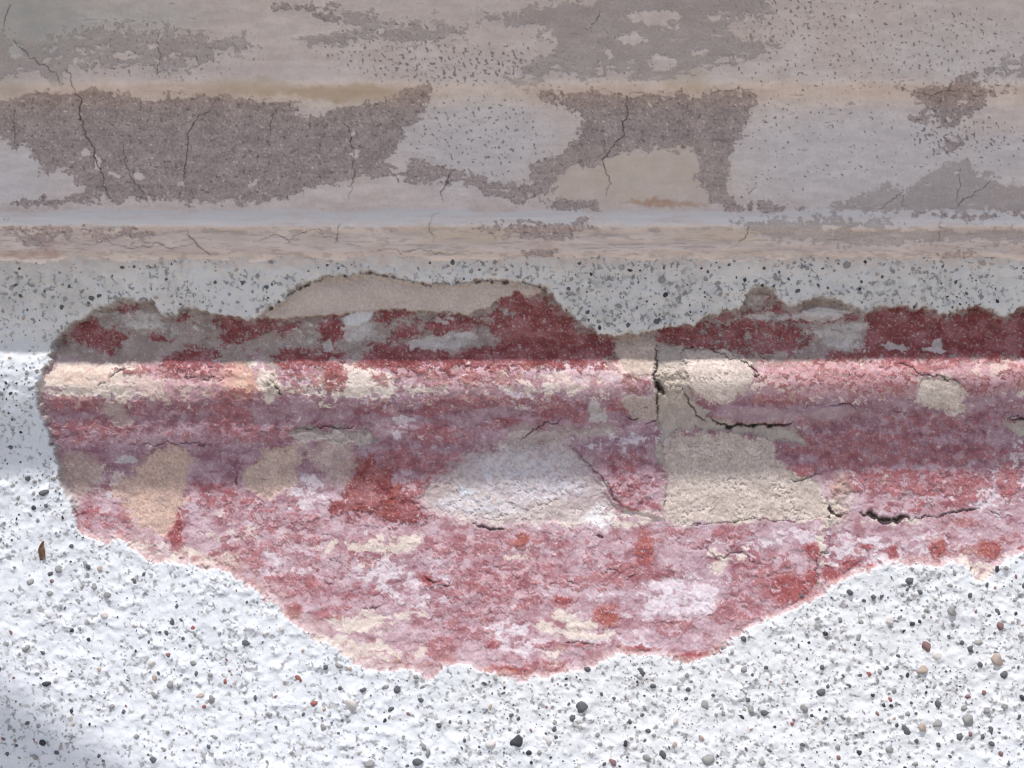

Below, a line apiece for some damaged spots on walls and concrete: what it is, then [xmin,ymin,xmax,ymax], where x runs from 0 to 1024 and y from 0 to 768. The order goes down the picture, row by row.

peeling [0,0,1024,259]
spalling [33,270,1024,685]
crack [631,347,759,422]
crack [714,421,793,429]